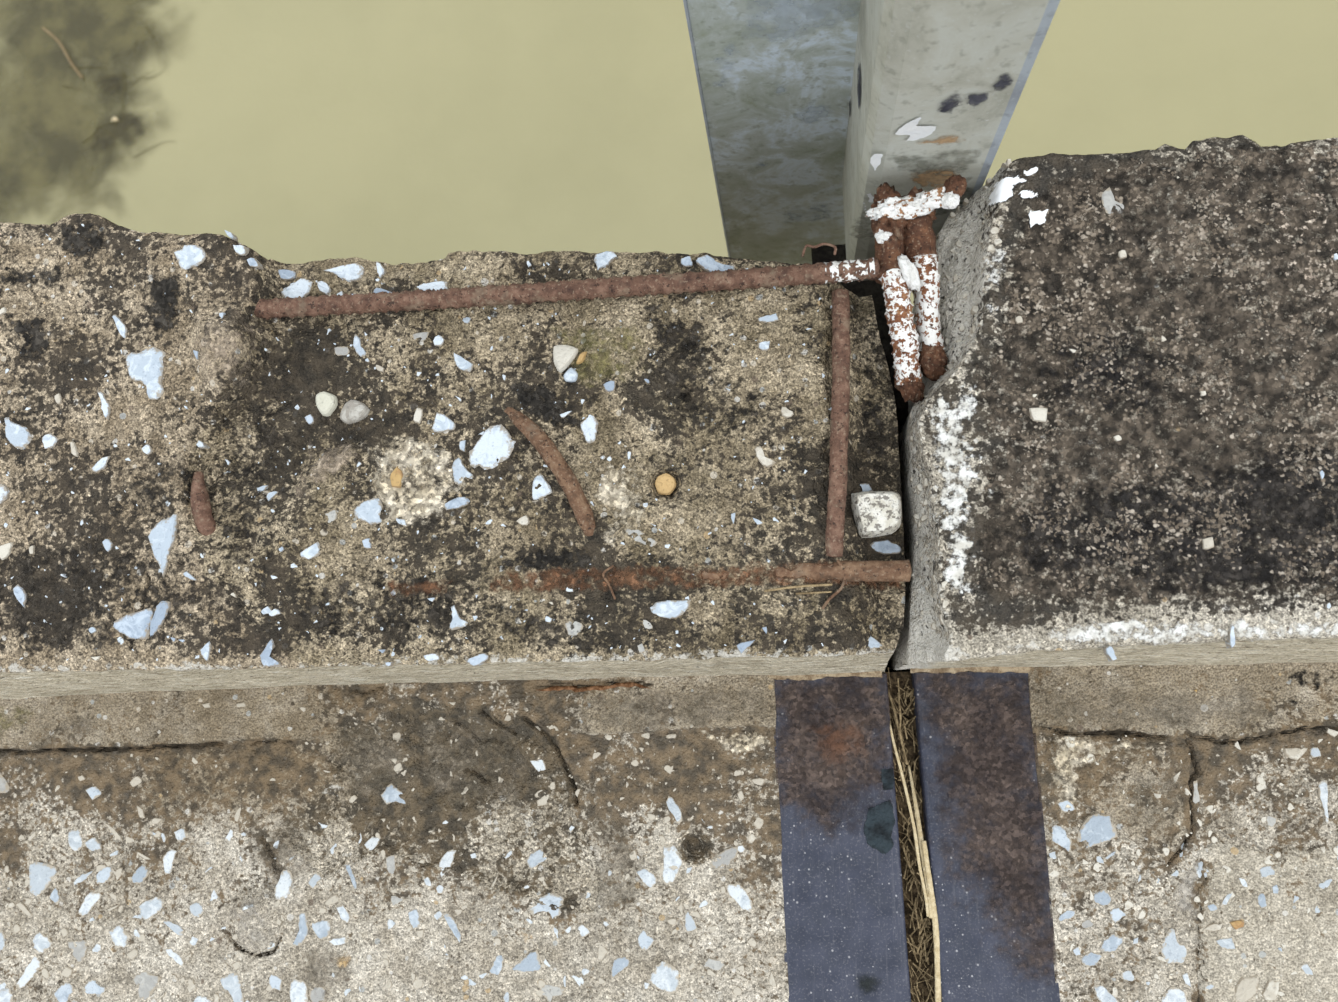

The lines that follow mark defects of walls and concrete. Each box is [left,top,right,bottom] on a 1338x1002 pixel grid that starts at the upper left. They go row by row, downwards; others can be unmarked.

spalling [165,229,949,668]
leakage [928,139,1338,646]
rust [489,562,902,591]
crack [0,742,218,753]
crack [1042,726,1329,855]